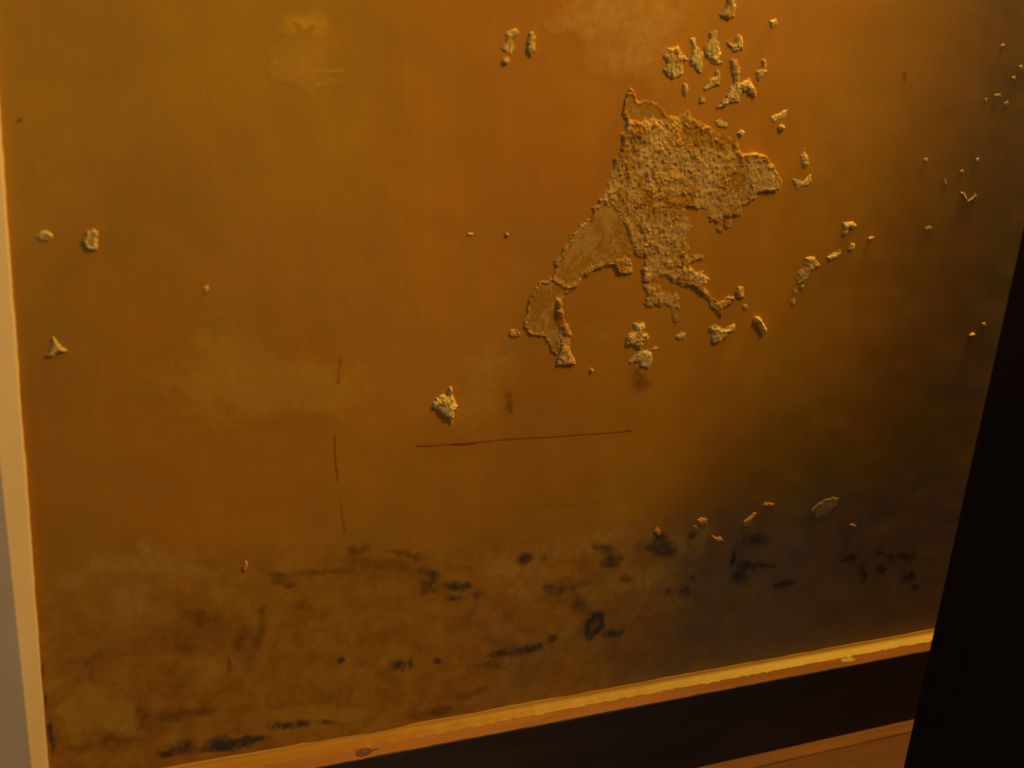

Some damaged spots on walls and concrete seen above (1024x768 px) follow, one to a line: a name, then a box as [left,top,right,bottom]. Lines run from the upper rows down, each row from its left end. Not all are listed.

flaking render [501,28,536,65]
flaking render [509,30,812,369]
flaking render [83,229,99,250]
flaking render [790,222,857,305]
flaking render [46,337,68,357]
flaking render [432,386,458,424]
crack [433,431,631,446]
peeling [743,502,774,527]
leakage [47,536,214,636]
leakage [483,520,767,618]
leakage [44,680,152,751]
leakage [203,735,264,751]